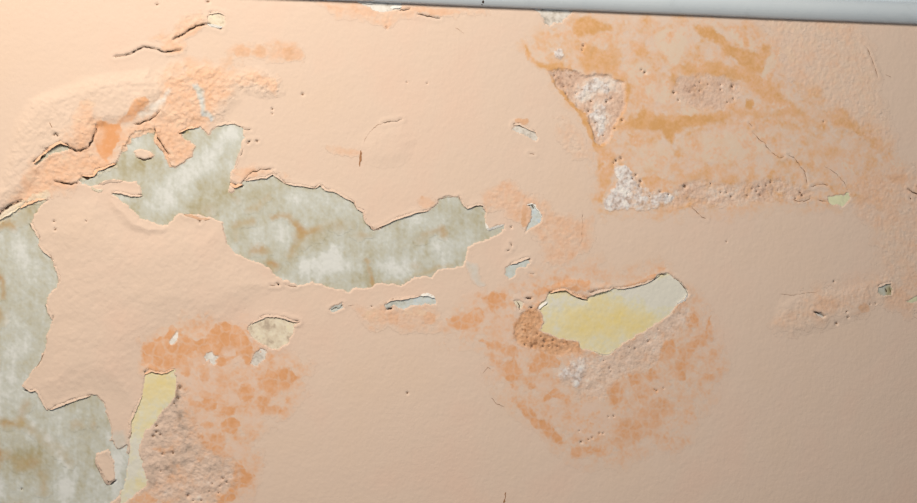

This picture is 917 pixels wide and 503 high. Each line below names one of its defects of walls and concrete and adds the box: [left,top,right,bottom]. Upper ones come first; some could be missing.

crack [115,12,220,57]
peeling [0,189,244,503]
damp [134,308,319,503]
peeling [248,314,299,366]
peeling [79,121,505,292]
peeling [385,293,436,309]
peeling [512,273,694,403]
damp [352,10,917,474]